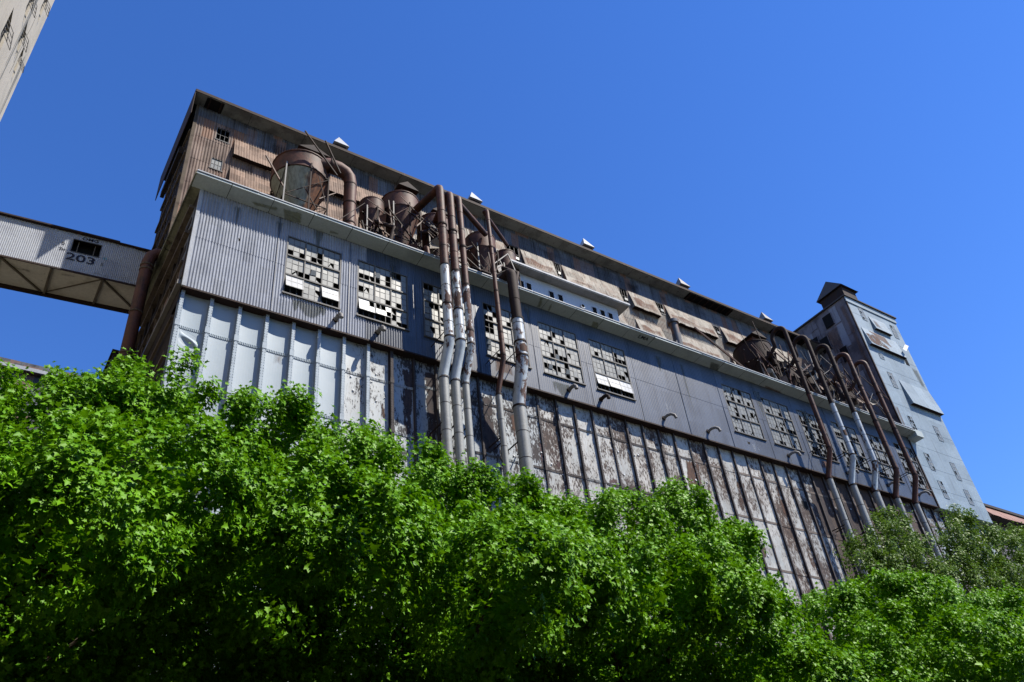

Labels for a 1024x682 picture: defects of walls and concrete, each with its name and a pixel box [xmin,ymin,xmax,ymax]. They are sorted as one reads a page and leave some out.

corrosion [841,307,890,364]
peeling [401,369,437,444]
peeling [483,394,518,456]
peeling [686,460,719,505]
peeling [735,479,749,511]
peeling [808,487,838,539]